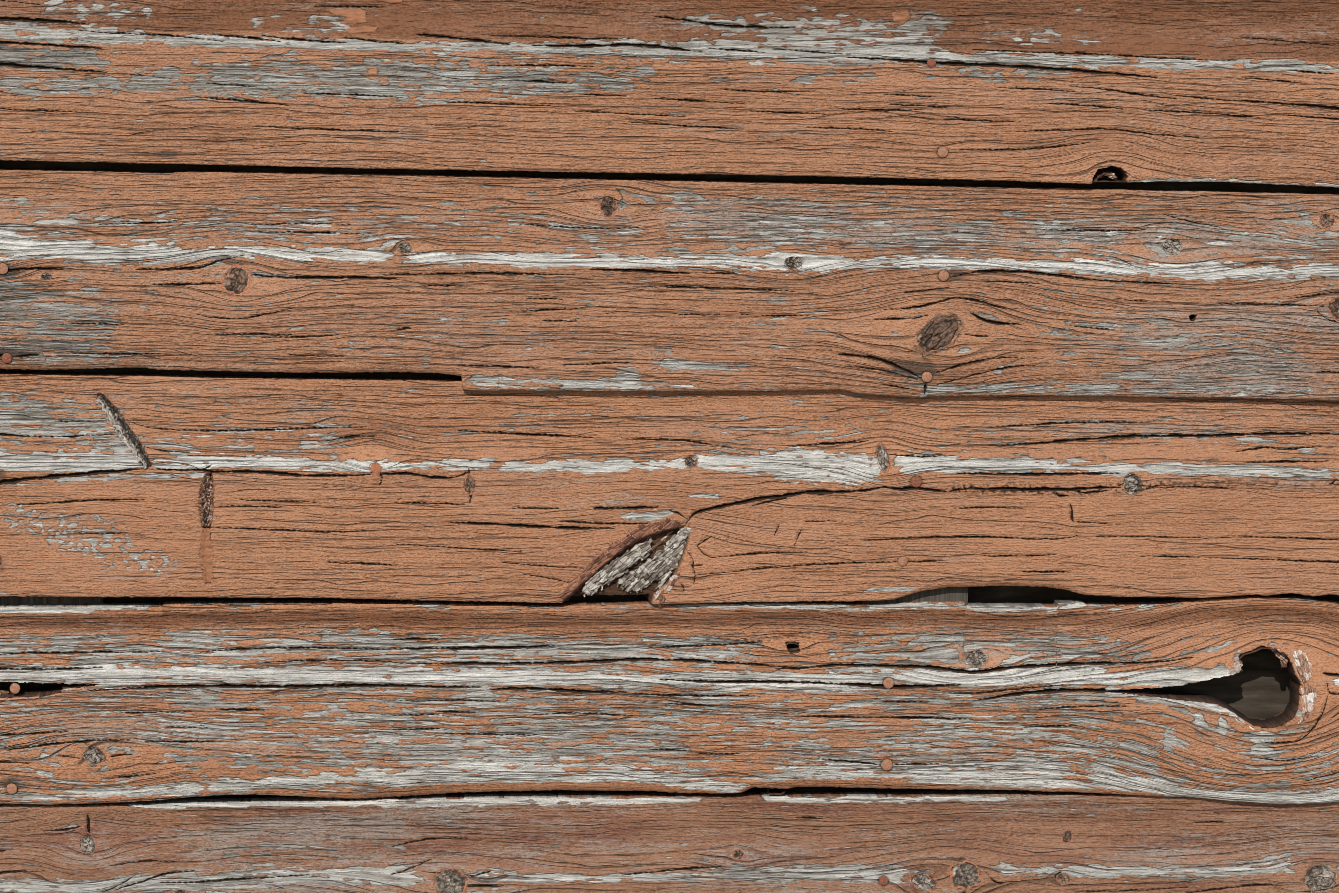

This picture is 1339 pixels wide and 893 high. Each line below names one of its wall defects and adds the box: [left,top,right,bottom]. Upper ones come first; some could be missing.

peeling [0,0,1339,107]
crack [0,0,1339,150]
crack [74,323,155,355]
crack [463,362,533,370]
peeling [0,190,1339,369]
peeling [0,389,1339,581]
crack [0,420,1339,591]
peeling [0,586,1339,893]